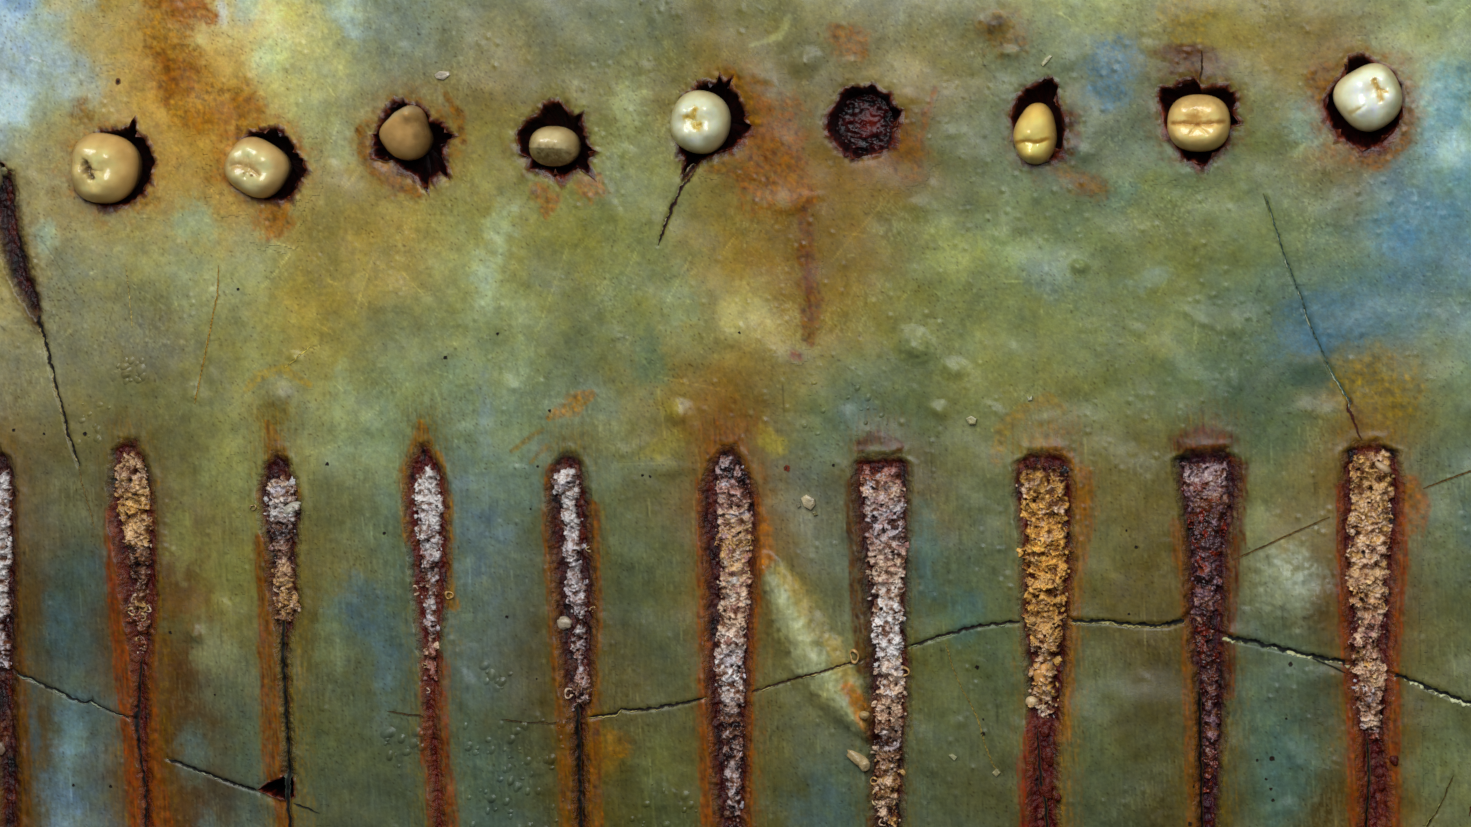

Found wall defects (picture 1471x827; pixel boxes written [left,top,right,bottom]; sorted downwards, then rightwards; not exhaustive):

rust [0,0,616,340]
crack [658,163,696,245]
crack [36,315,96,529]
crack [17,621,319,827]
rust [230,382,329,827]
crack [501,697,707,827]
rust [672,379,787,827]
rust [991,382,1113,827]
rust [1146,377,1265,827]
crack [1222,634,1350,674]
rust [1305,327,1444,827]
crack [1394,673,1471,707]